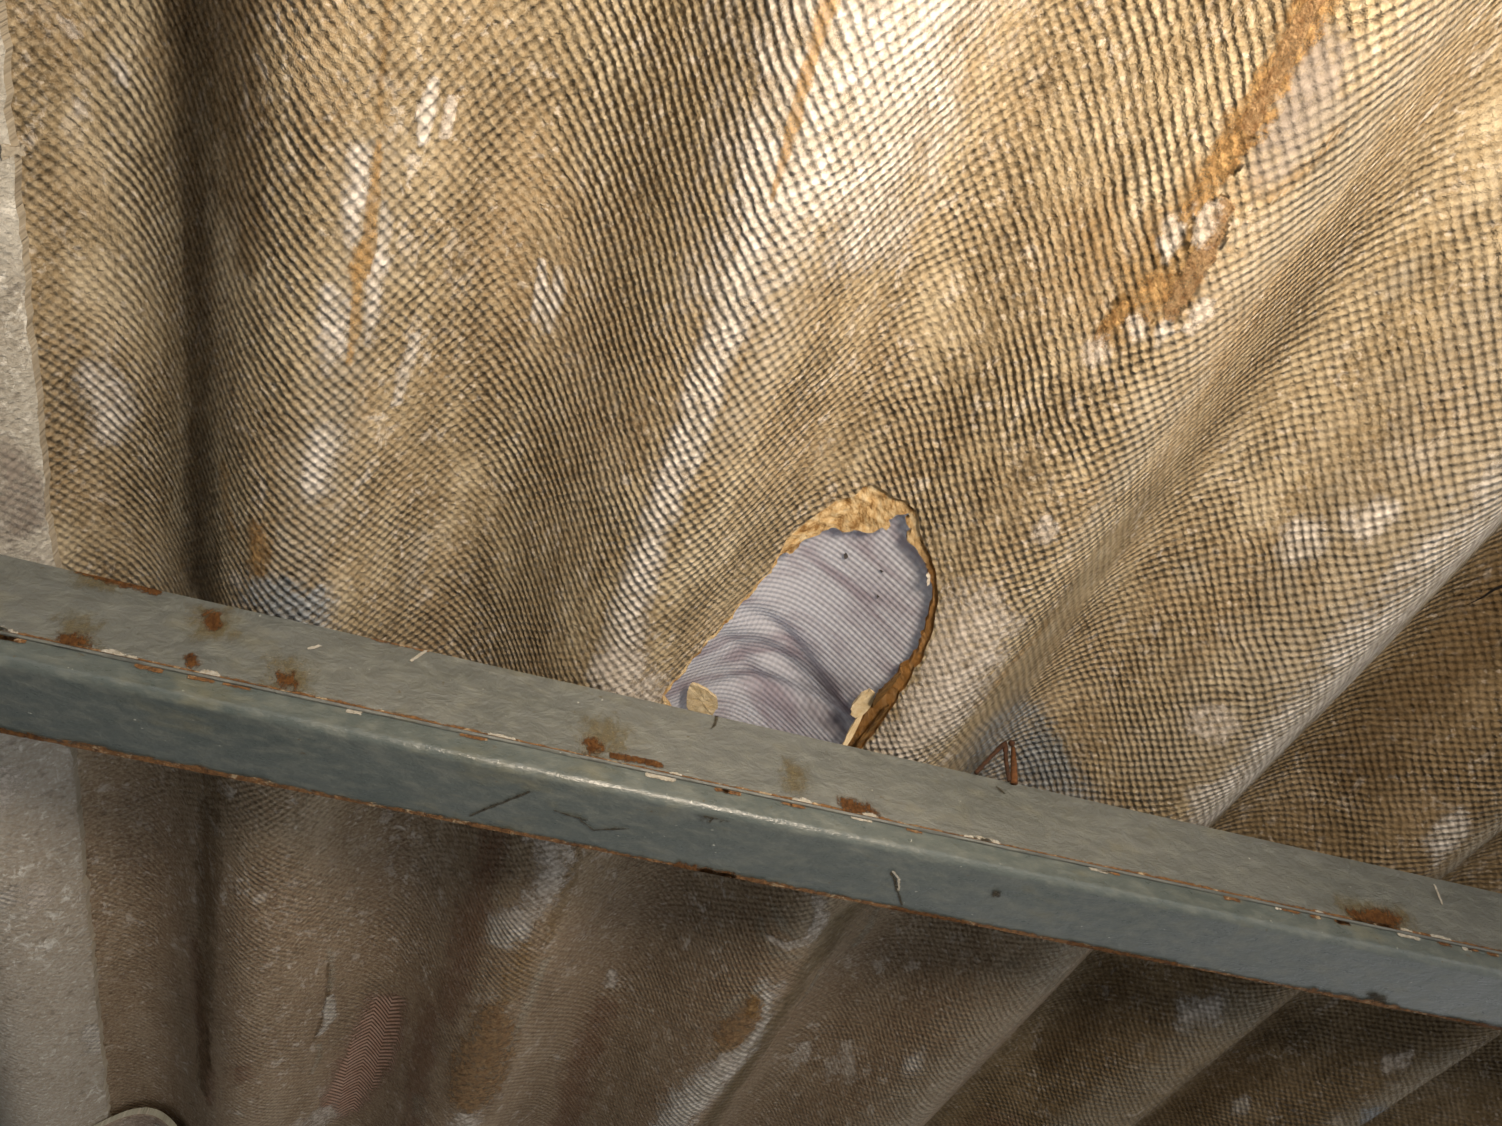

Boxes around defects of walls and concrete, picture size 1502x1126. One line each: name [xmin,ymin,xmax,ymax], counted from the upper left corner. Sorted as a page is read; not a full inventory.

rust [772,0,840,197]
rust [1092,0,1341,349]
rust [76,571,162,596]
rust [201,609,223,632]
hole [662,484,938,749]
crack [1467,585,1502,605]
rust [0,626,1502,1031]